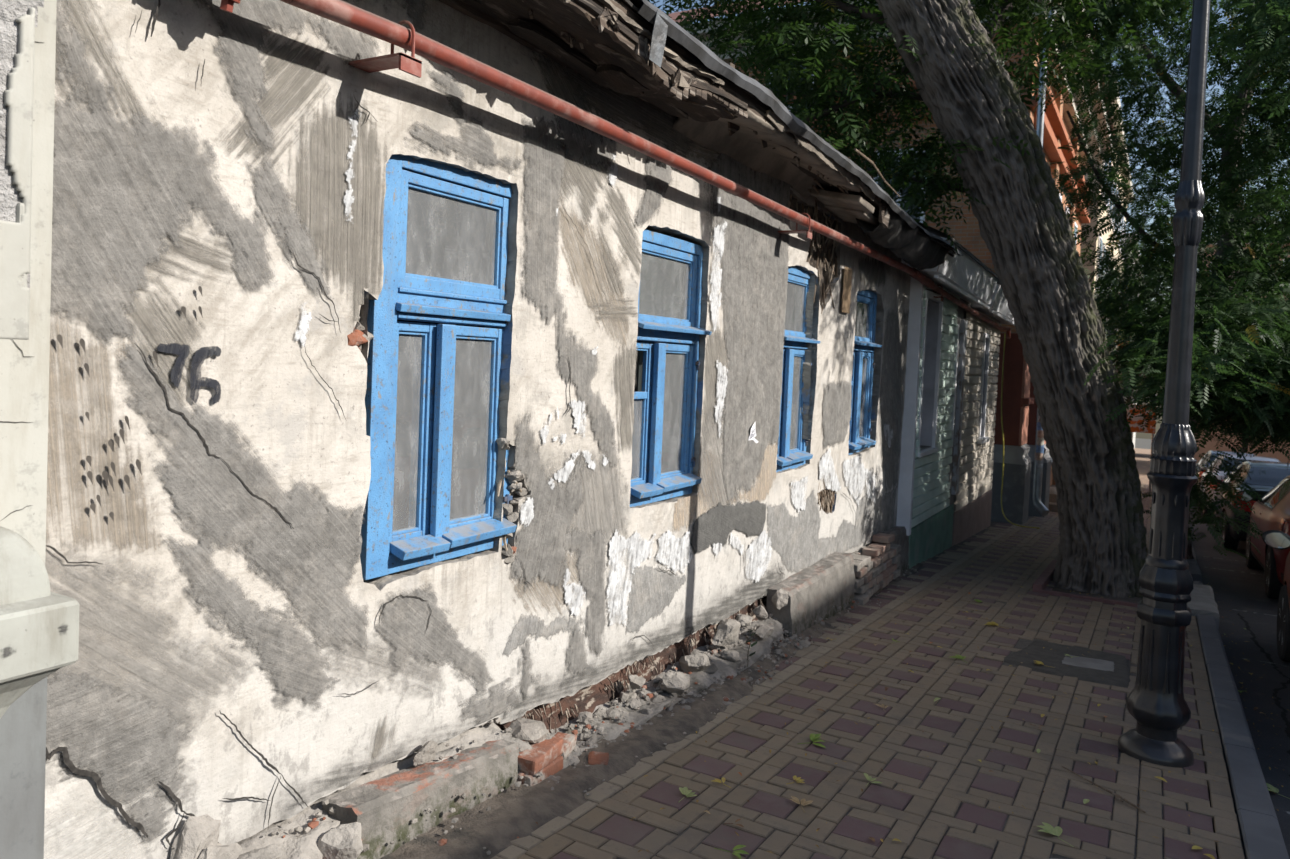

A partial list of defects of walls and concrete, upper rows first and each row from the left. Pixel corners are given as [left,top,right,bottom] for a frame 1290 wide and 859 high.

spalling [0,0,44,222]
crack [135,344,294,529]
peeling [563,569,586,616]
peeling [607,442,777,626]
peeling [714,360,728,439]
peeling [791,448,876,513]
crack [46,747,195,850]
crack [219,710,308,827]